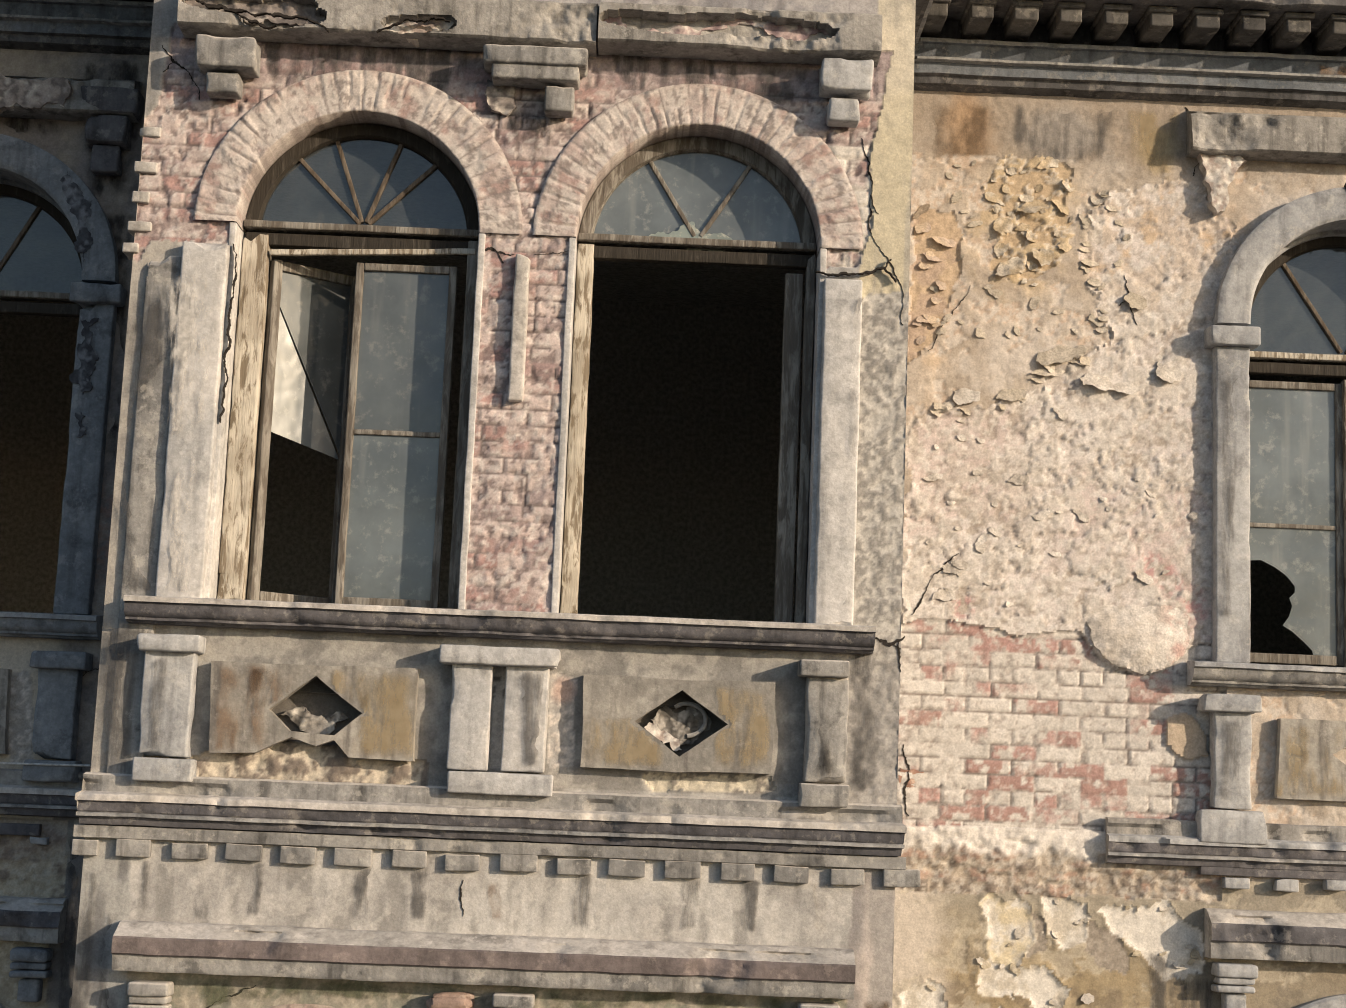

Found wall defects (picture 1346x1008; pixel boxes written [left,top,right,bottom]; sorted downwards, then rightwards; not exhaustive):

crack [162,45,200,100]
flaking render [122,0,894,612]
crack [816,138,904,325]
crack [875,553,959,672]
peeling [895,153,1247,1008]